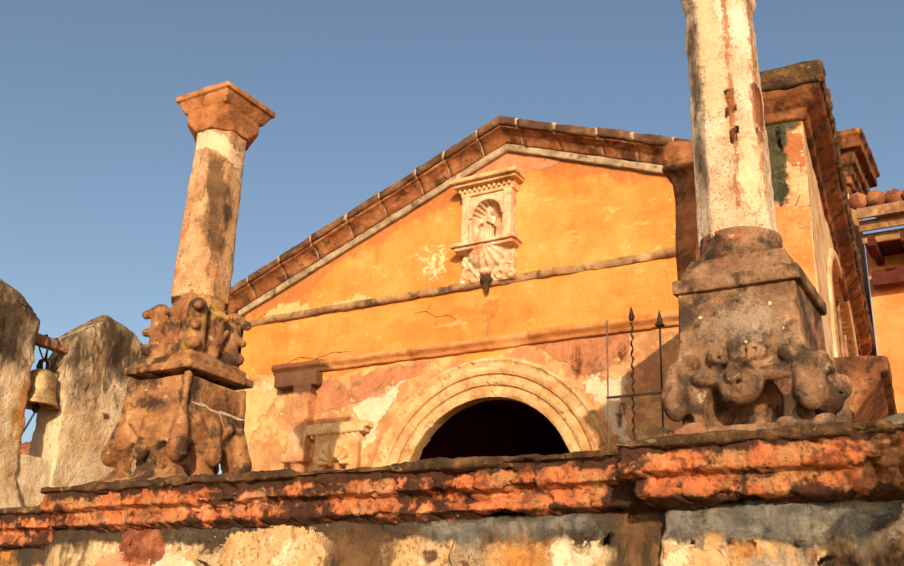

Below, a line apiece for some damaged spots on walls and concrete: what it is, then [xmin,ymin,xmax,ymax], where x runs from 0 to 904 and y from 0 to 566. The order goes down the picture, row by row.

water stain [204,156,231,259]
flaking render [736,135,767,216]
water stain [765,121,800,203]
flaking render [406,244,448,288]
crack [192,401,245,426]
flaking render [316,363,423,454]
flaking render [87,547,196,566]
water stain [609,497,904,566]